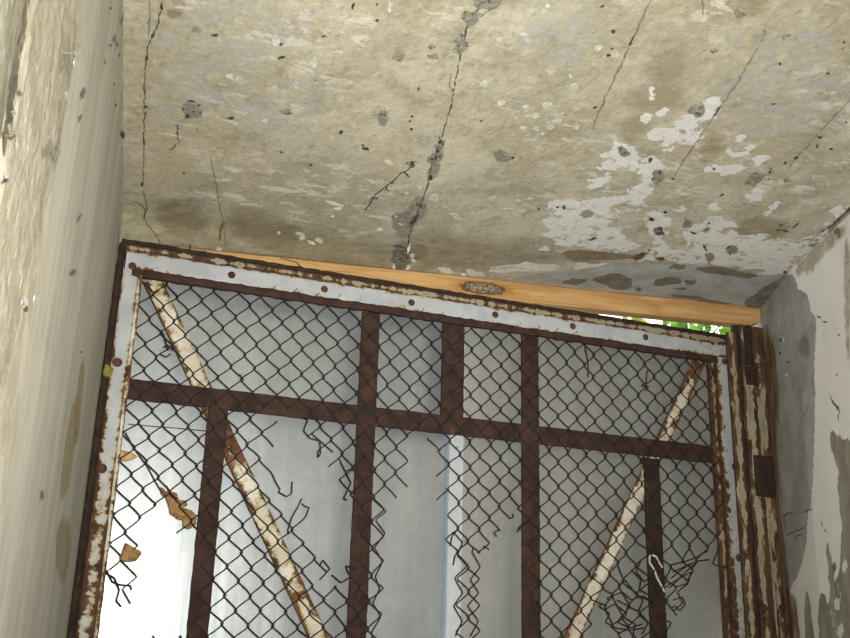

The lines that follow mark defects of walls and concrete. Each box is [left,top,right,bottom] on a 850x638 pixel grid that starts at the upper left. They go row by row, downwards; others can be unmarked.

crack [131,0,163,244]
crack [393,1,491,247]
crack [592,0,651,130]
peeling [501,96,850,275]
crack [671,25,767,180]
crack [790,102,849,166]
peeling [438,261,560,282]
leakage [564,250,631,261]
leakage [563,273,642,292]
leakage [653,264,731,304]
leakage [696,266,757,278]
peeling [804,431,850,638]